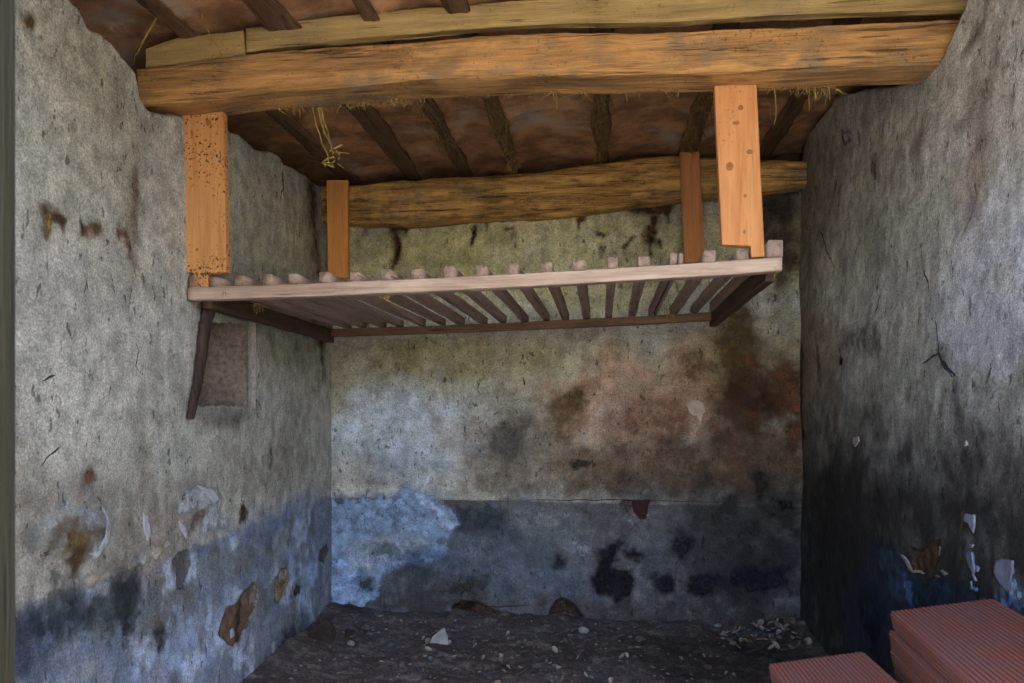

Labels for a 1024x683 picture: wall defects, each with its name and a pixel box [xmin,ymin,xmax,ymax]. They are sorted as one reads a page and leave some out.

rust [41,206,67,237]
rust [81,223,101,238]
crack [923,321,956,377]
peeling [687,400,706,425]
water stain [15,575,141,645]
peeling [31,484,229,590]
water stain [155,628,168,650]
flaking render [218,583,257,646]
water stain [552,506,660,603]
water stain [654,566,790,597]
peeling [900,512,980,608]
peeling [993,559,1024,614]